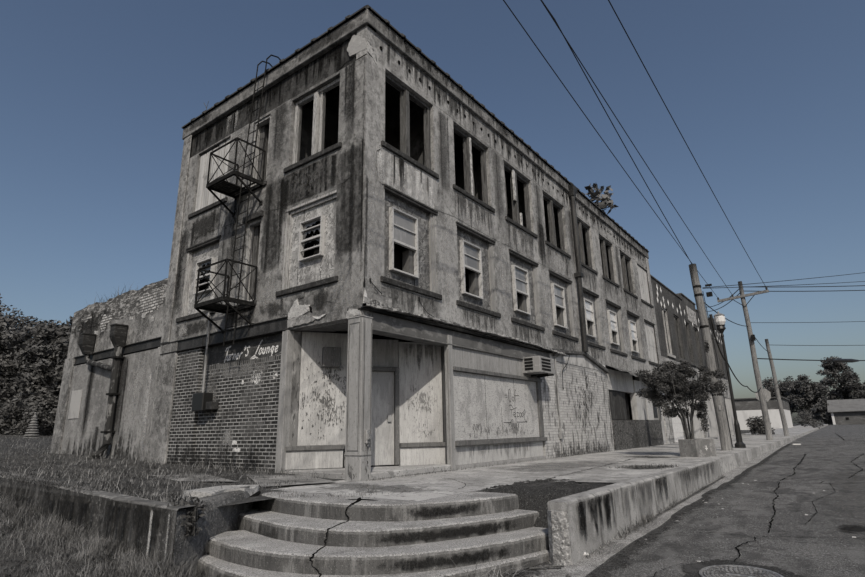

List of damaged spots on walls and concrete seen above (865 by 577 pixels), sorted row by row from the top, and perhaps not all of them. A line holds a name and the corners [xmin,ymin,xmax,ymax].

flaking render [347,35,377,65]
water stain [231,139,368,326]
water stain [75,309,107,344]
flaking render [287,292,326,328]
water stain [68,357,152,460]
water stain [103,500,170,555]
crack [309,497,373,577]